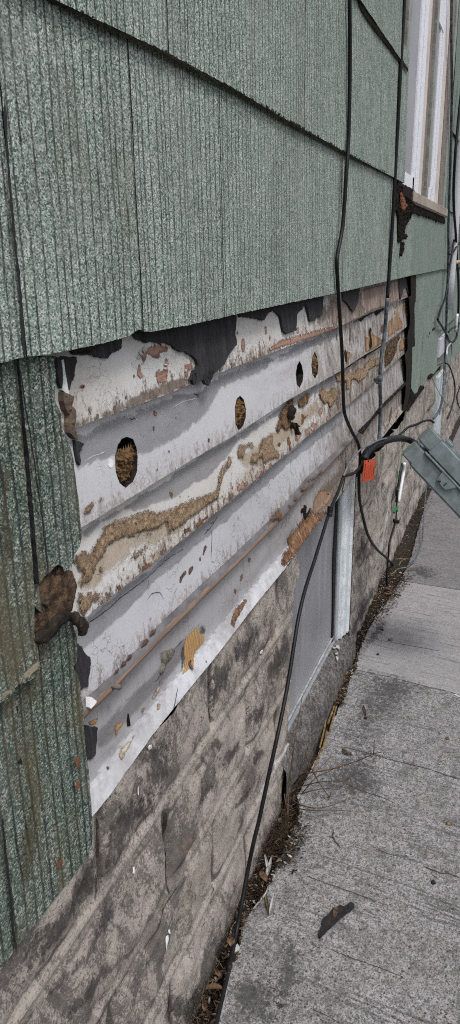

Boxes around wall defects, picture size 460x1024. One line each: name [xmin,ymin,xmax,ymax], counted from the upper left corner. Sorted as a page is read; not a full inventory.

peeling [360,280,410,352]
peeling [59,359,69,394]
peeling [133,342,170,385]
spalling [358,381,406,434]
peeling [86,697,98,725]
leakage [98,642,185,745]
peeling [183,628,207,673]
leakage [206,619,273,712]
leakage [248,632,291,723]
leakage [235,744,289,808]
leakage [21,731,172,976]
leakage [64,965,117,1024]